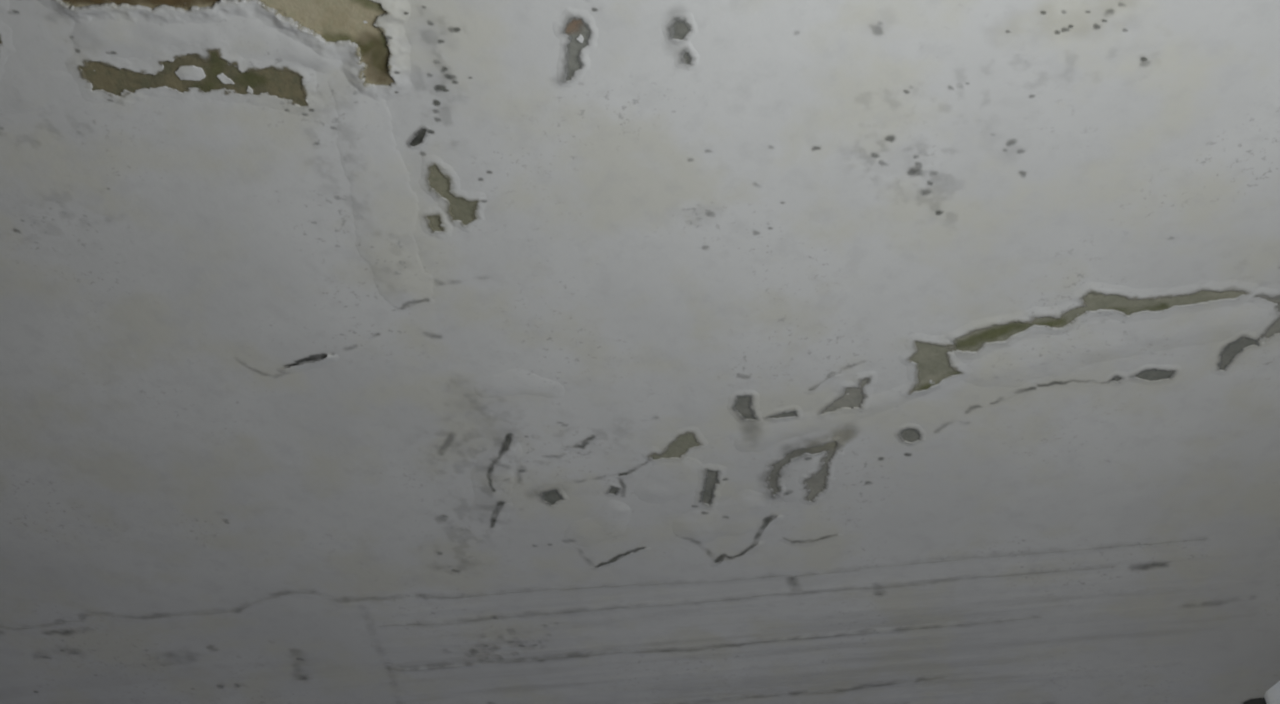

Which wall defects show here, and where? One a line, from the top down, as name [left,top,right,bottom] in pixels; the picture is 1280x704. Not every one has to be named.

peeling [37,0,412,116]
peeling [552,7,599,88]
peeling [661,12,700,71]
peeling [406,125,492,241]
crack [276,353,340,374]
peeling [726,370,878,425]
peeling [898,279,1280,399]
peeling [534,485,569,508]
peeling [641,426,728,511]
peeling [760,436,847,505]
spalling [893,423,927,456]